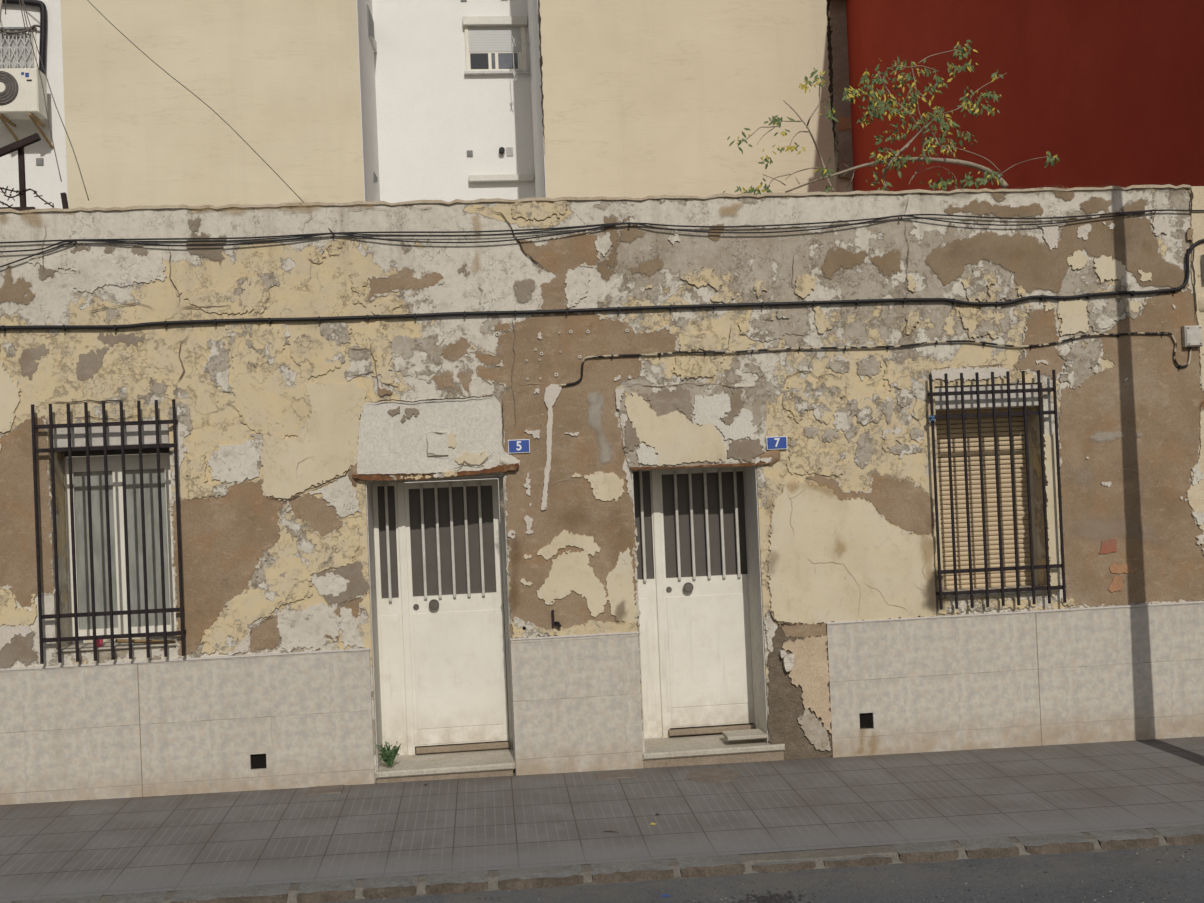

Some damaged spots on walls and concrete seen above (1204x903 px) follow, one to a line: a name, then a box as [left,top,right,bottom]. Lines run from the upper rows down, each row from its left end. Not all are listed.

flaking render [0,335,55,668]
peeling [0,242,167,305]
flaking render [76,331,145,381]
flaking render [168,214,916,658]
flaking render [764,187,1204,760]